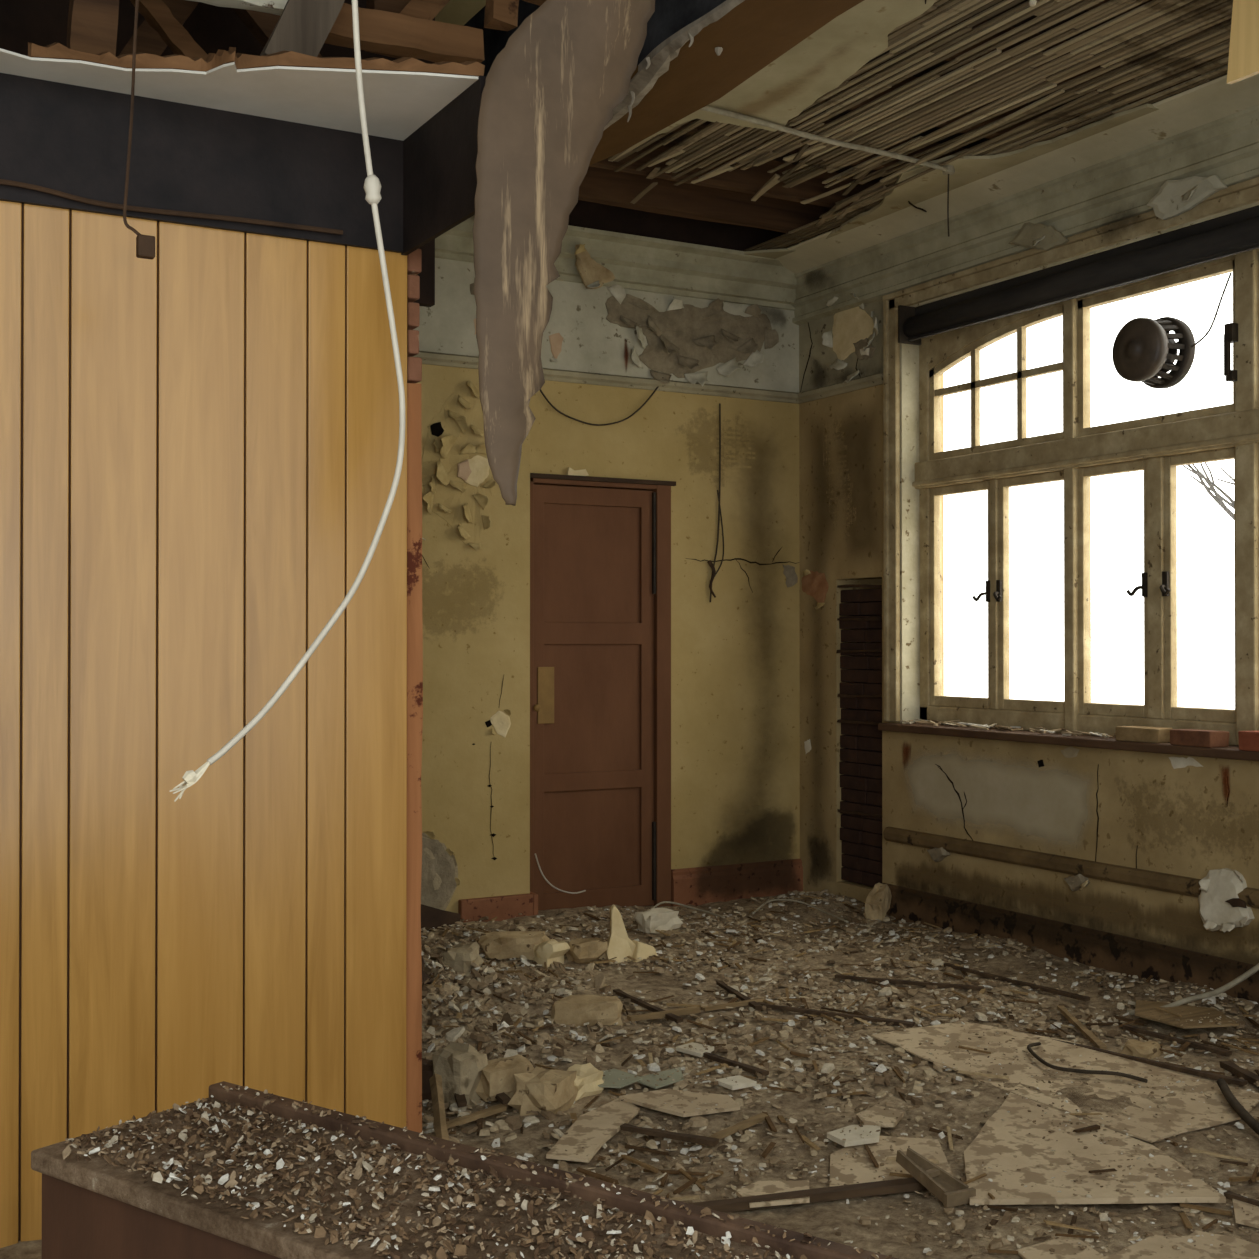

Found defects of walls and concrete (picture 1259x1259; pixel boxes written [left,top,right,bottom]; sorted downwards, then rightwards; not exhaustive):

flaking render [1147,175,1228,220]
spalling [574,244,779,386]
peeling [822,293,878,384]
peeling [422,379,496,551]
crack [935,764,973,841]
spalling [421,831,461,910]
spalling [1198,868,1255,933]